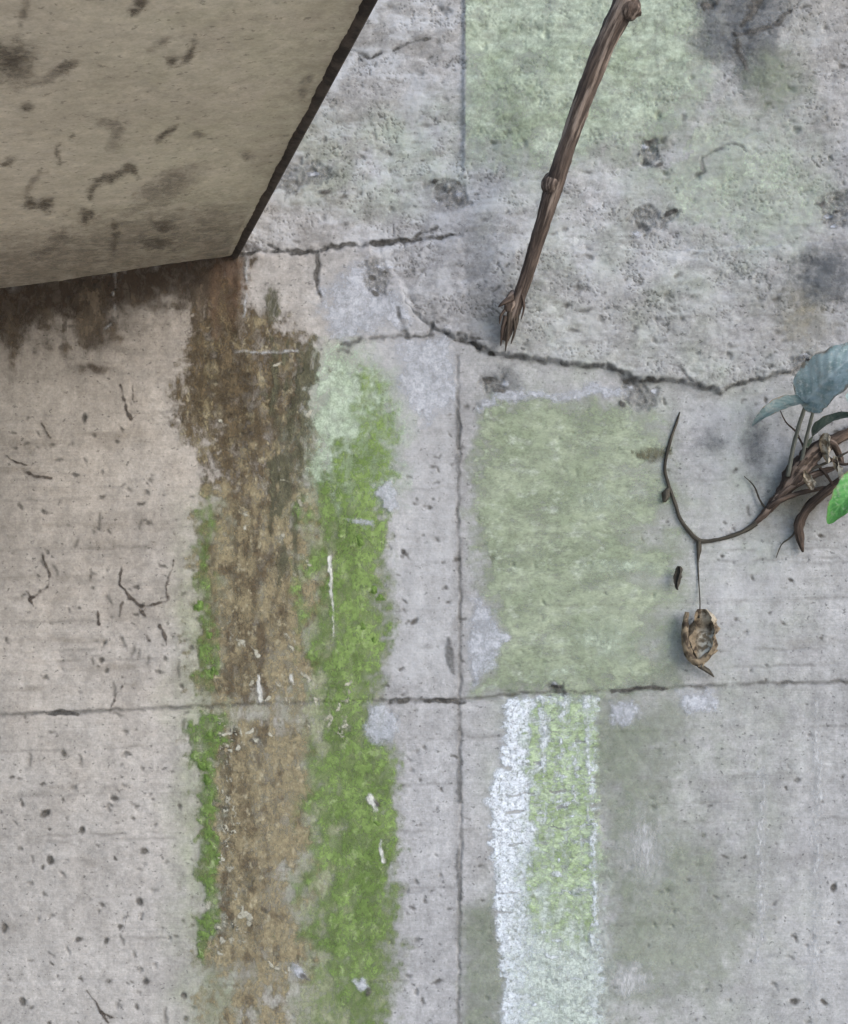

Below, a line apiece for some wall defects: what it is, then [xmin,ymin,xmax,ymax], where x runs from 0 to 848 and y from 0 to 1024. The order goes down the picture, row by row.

crack [239,226,454,295]
crack [338,308,741,397]
leakage [631,448,672,462]
leakage [0,210,352,1024]
efflorescence [485,696,606,1024]